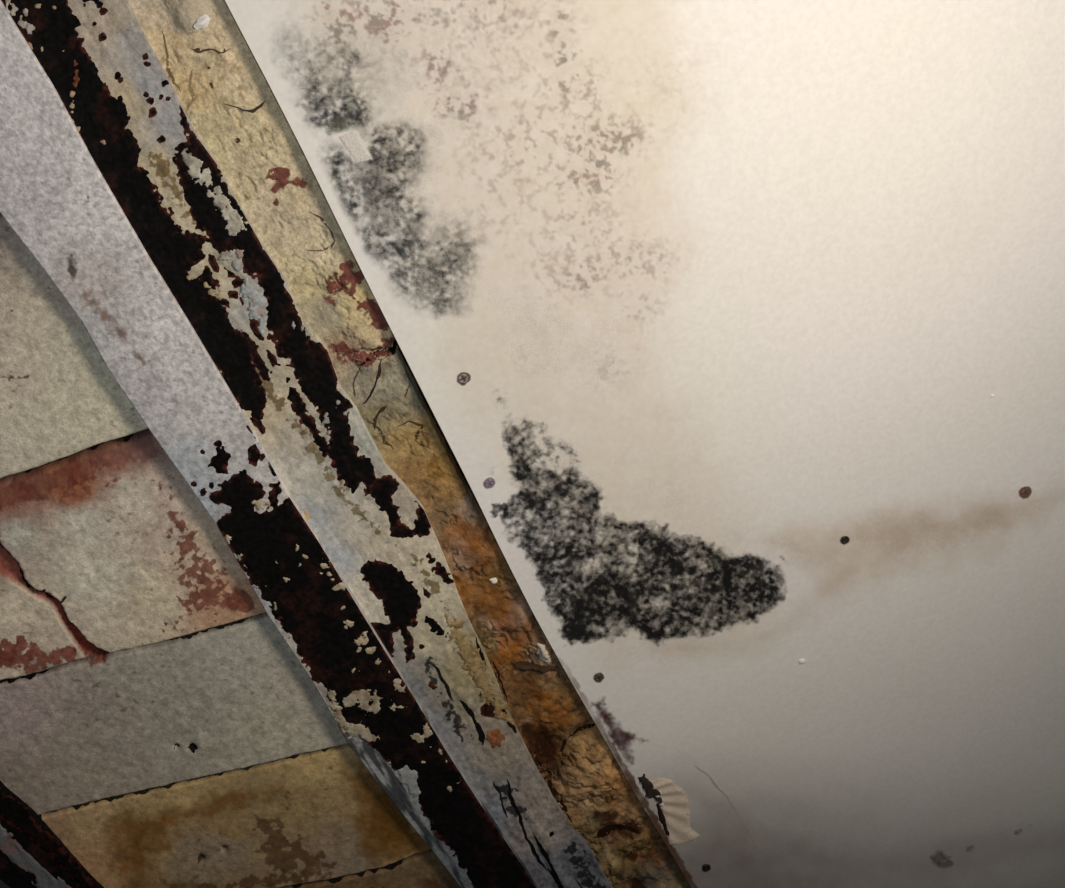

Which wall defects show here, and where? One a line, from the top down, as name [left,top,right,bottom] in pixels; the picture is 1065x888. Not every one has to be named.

leakage [305,54,368,133]
peeling [266,167,307,206]
leakage [331,128,471,313]
peeling [324,260,397,367]
crack [26,433,134,473]
rust [0,0,536,888]
crack [0,543,106,652]
peeling [159,485,254,632]
leakage [492,421,784,645]
rust [522,723,560,780]
peeling [0,824,71,888]
rust [596,812,641,860]